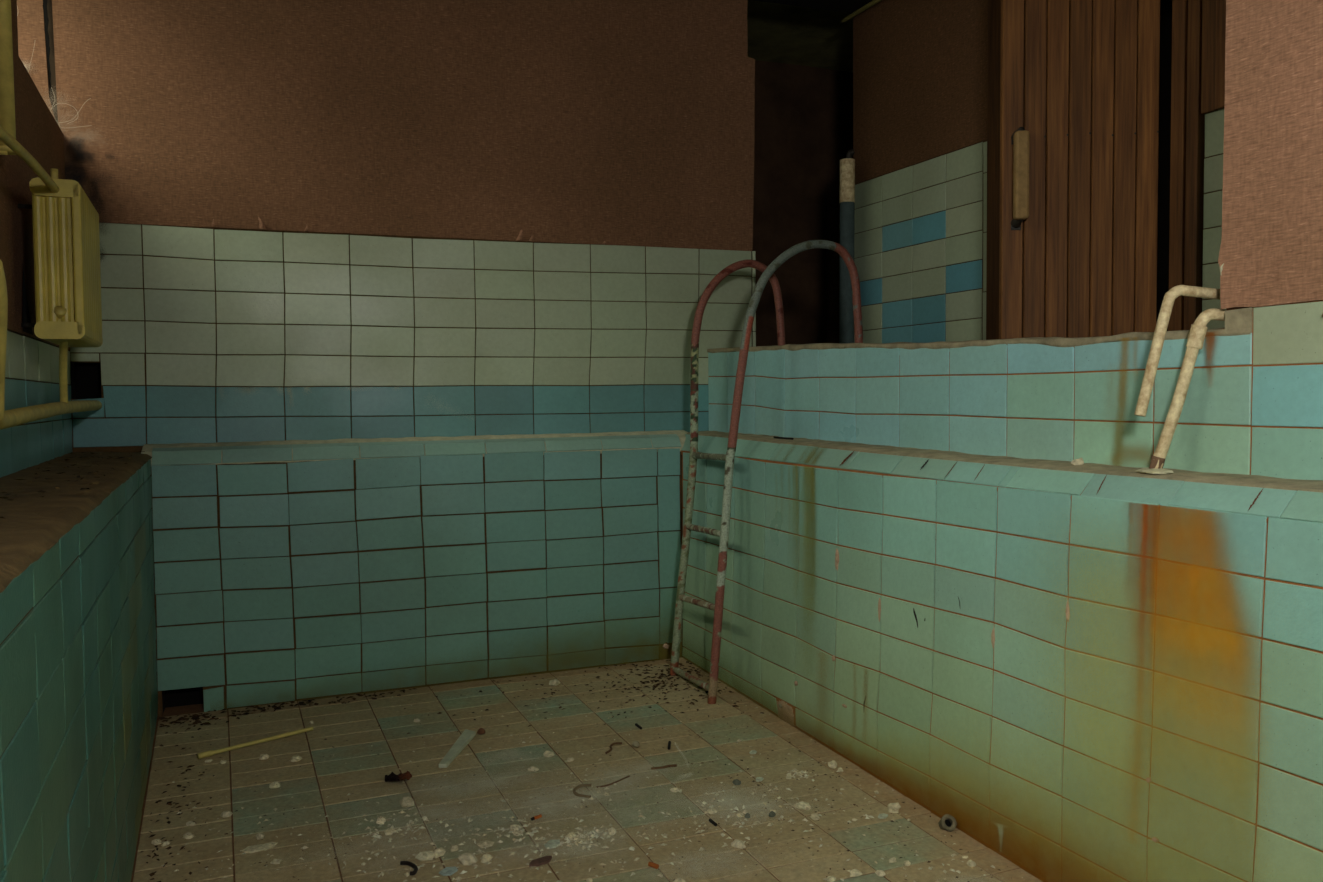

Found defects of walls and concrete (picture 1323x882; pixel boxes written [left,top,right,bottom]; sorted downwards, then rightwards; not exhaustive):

rust [682,625,1323,882]